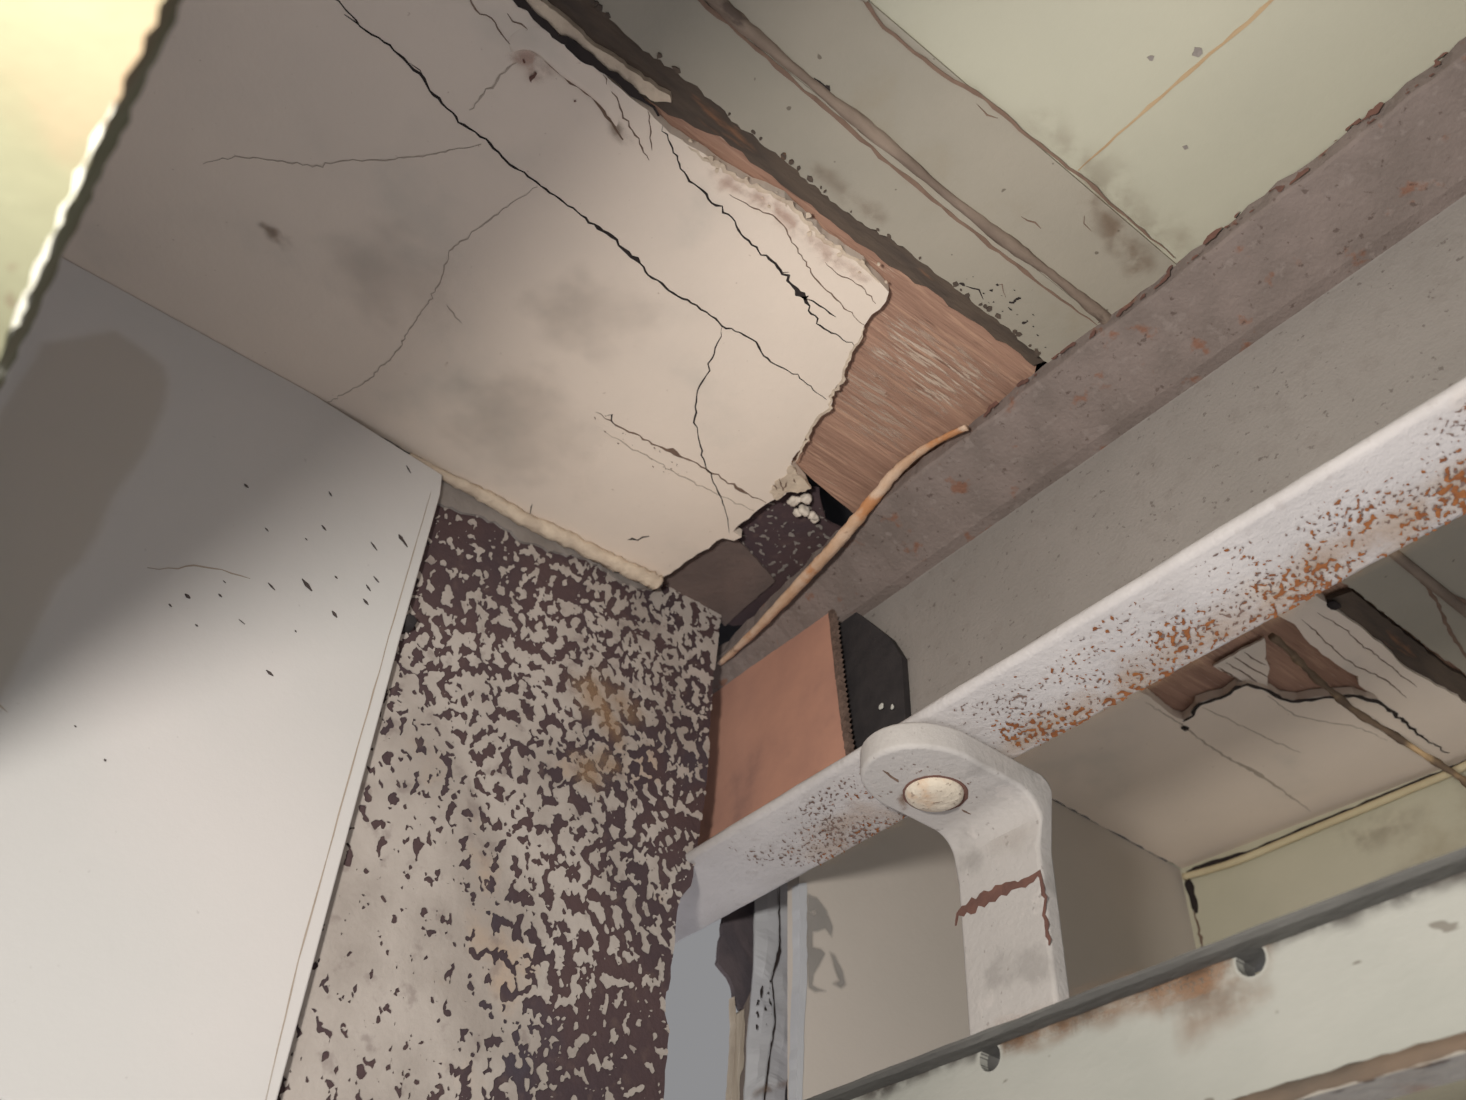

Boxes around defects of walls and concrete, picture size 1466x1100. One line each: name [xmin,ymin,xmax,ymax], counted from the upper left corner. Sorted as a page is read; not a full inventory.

peeling [279,436,721,1100]
crack [204,0,824,529]
crack [604,76,876,345]
flaking render [681,138,887,284]
peeling [742,321,987,580]
peeling [953,276,1046,357]
rust [942,403,1466,752]
peeling [1213,636,1269,686]
crack [1147,612,1466,947]
crack [1420,582,1466,658]